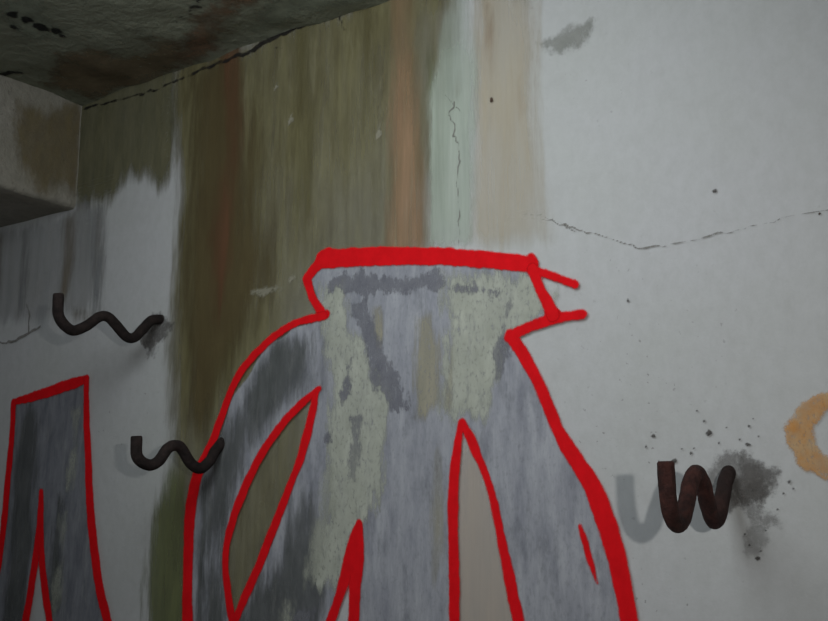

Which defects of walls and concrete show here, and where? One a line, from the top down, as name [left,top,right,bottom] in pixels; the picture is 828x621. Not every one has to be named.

damp [545,22,591,51]
damp [186,55,258,426]
crack [449,101,460,243]
damp [430,0,529,244]
crack [550,219,732,249]